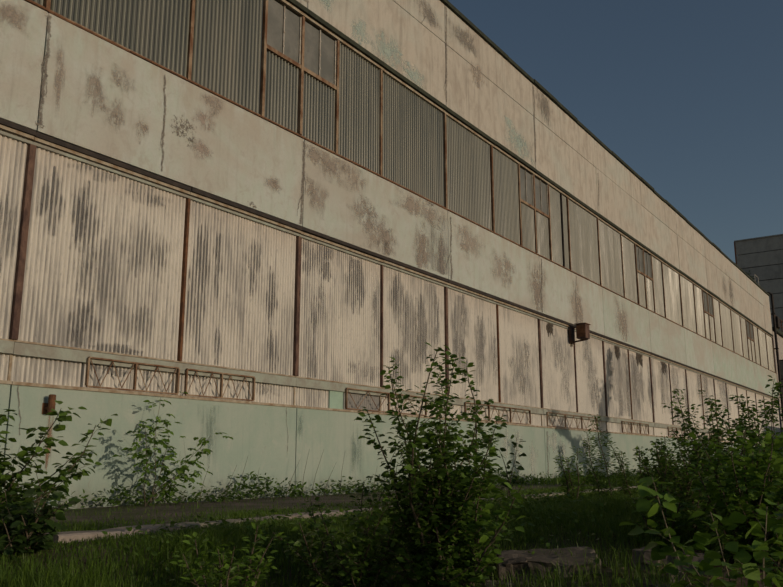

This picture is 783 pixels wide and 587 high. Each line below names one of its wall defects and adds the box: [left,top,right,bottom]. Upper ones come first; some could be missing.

crack [38,16,51,126]
crack [159,75,167,171]
water stain [407,197,448,275]